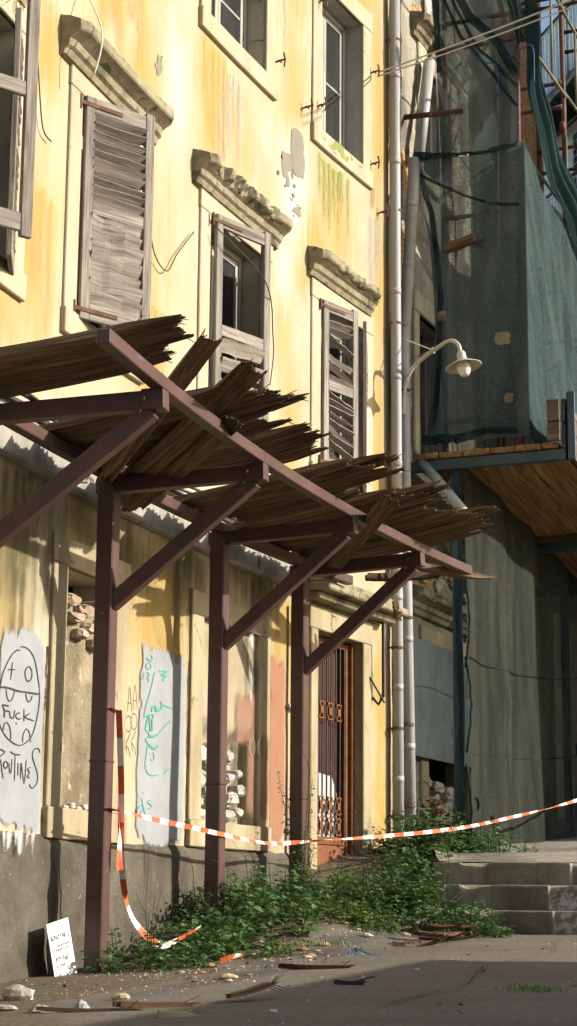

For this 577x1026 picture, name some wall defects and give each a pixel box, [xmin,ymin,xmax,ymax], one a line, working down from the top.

peeling [278,128,305,217]
leakage [319,153,350,213]